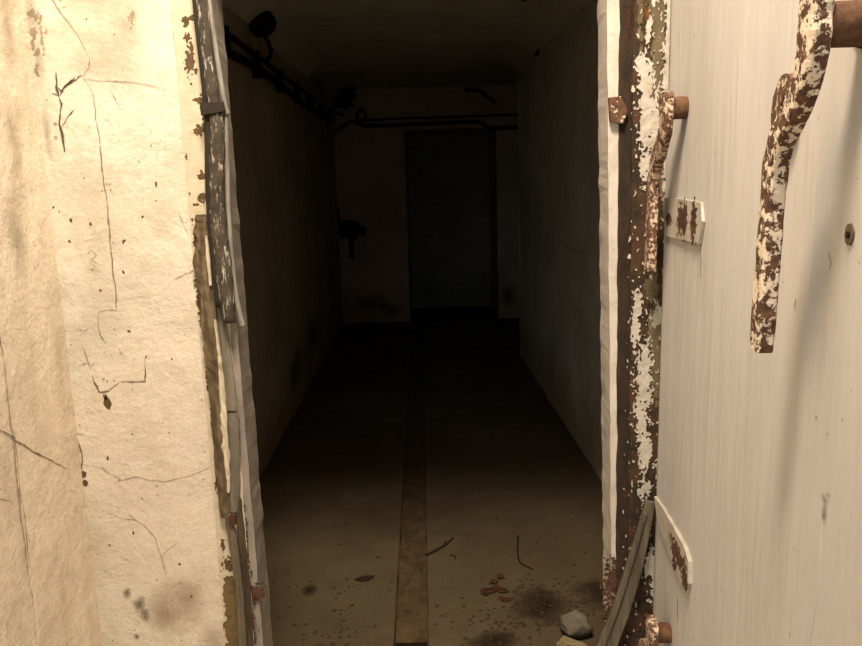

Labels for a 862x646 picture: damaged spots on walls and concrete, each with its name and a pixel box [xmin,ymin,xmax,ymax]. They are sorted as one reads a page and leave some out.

peeling [181,15,198,85]
peeling [193,116,204,138]
crack [52,1,147,393]
peeling [191,218,212,286]
peeling [623,0,671,517]
corrosion [665,197,697,246]
crack [0,341,206,641]
peeling [220,539,233,572]
peeling [624,534,655,646]
corrosion [669,533,688,593]